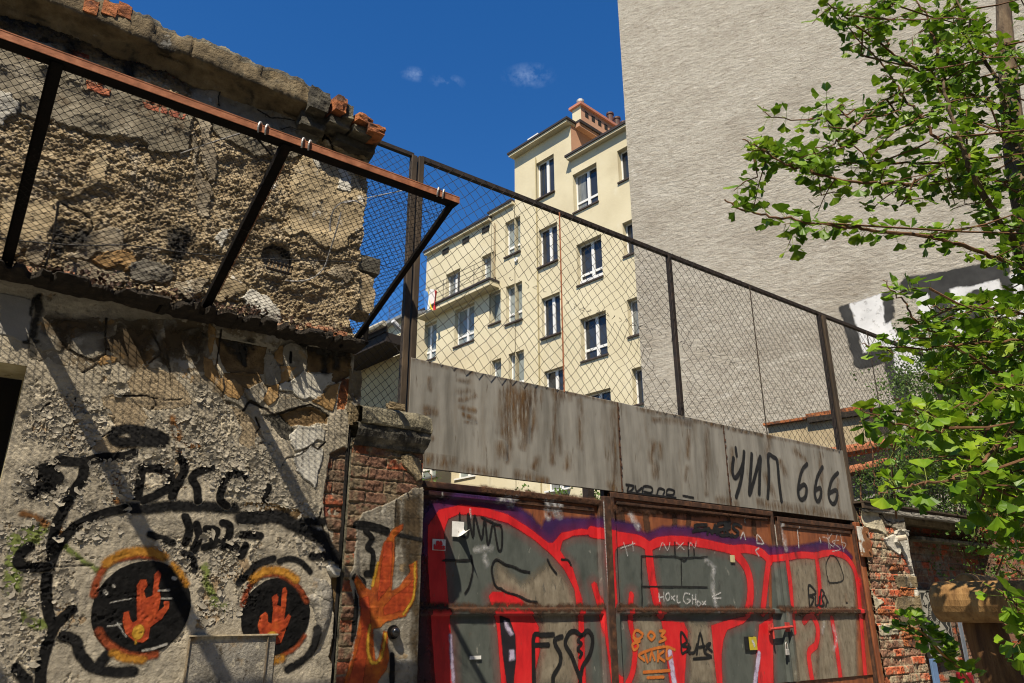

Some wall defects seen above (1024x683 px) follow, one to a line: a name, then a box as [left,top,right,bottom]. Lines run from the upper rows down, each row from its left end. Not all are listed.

flaking render [0,49,48,128]
flaking render [50,71,366,276]
flaking render [61,226,211,300]
flaking render [214,275,282,322]
flaking render [326,263,354,284]
rust [499,379,541,459]
flaking render [0,317,424,683]
rust [419,602,860,615]
flaking render [860,509,922,648]